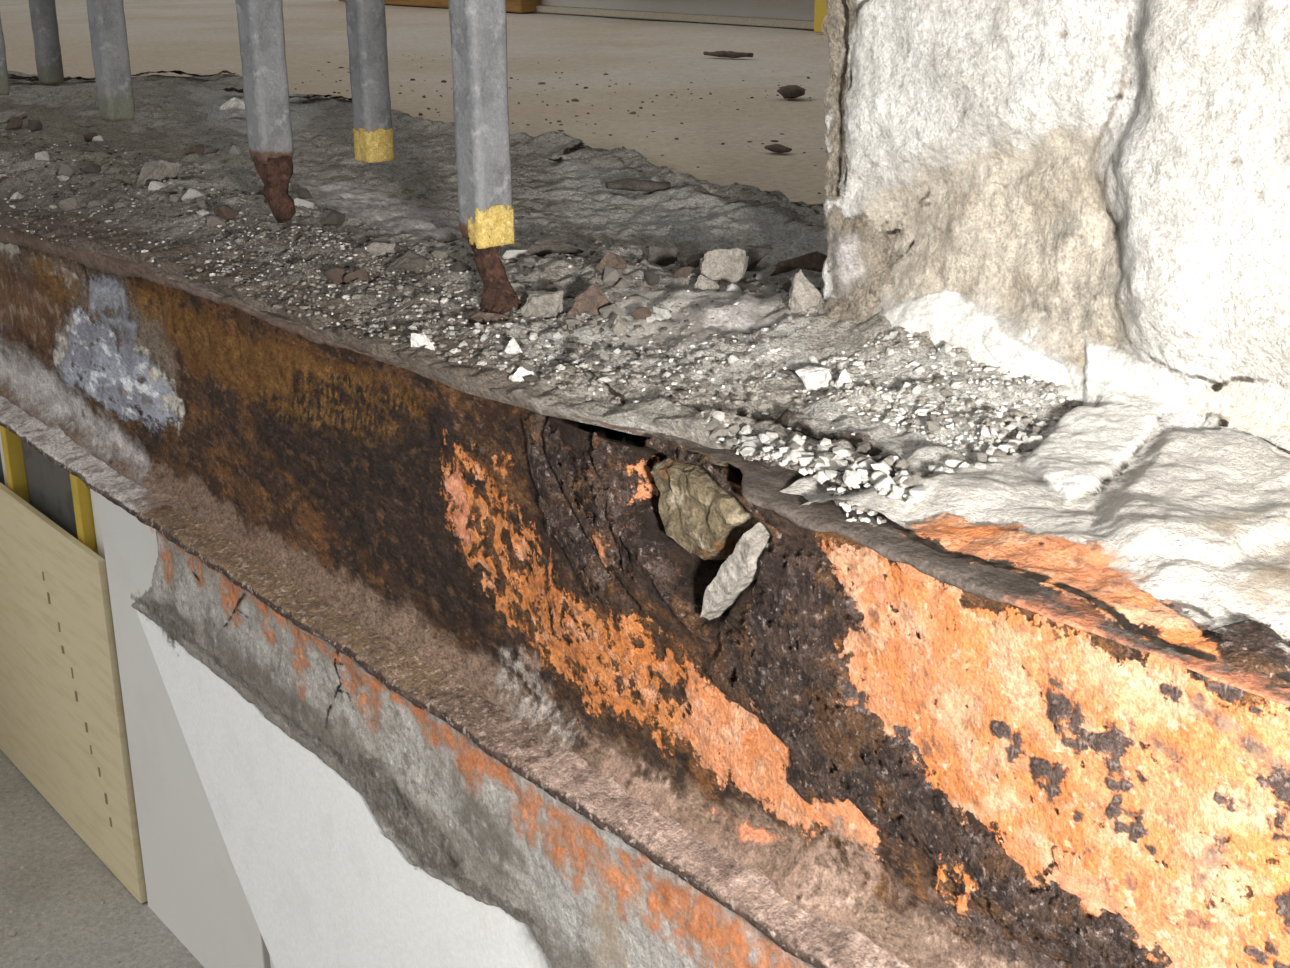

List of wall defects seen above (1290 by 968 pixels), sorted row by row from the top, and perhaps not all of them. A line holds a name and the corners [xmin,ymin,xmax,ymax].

spalling [302,184,458,240]
spalling [549,0,1126,368]
damp [0,346,180,507]
peeling [0,242,185,431]
crack [1115,294,1290,454]
crack [224,593,248,626]
crack [325,650,354,728]
corrosion [132,281,688,794]
corrosion [149,526,806,968]
corrosion [989,674,1156,856]
corrosion [1160,672,1290,855]
corrosion [1246,891,1290,968]